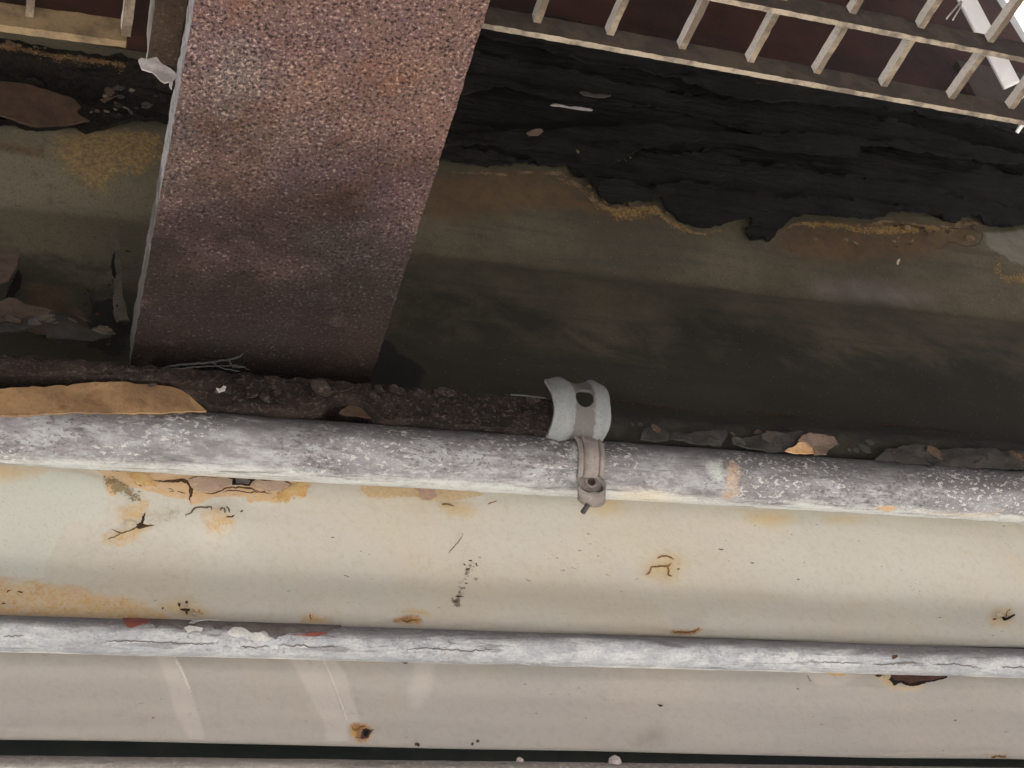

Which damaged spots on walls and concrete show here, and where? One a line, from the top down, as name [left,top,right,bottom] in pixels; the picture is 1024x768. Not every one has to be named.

peeling [0,81,90,128]
peeling [550,91,611,111]
peeling [0,370,206,417]
peeling [631,422,1024,471]
spalling [91,470,322,508]
crack [185,502,244,542]
rust [627,538,700,594]
rust [0,575,218,621]
rust [384,604,437,629]
spalling [801,672,947,695]